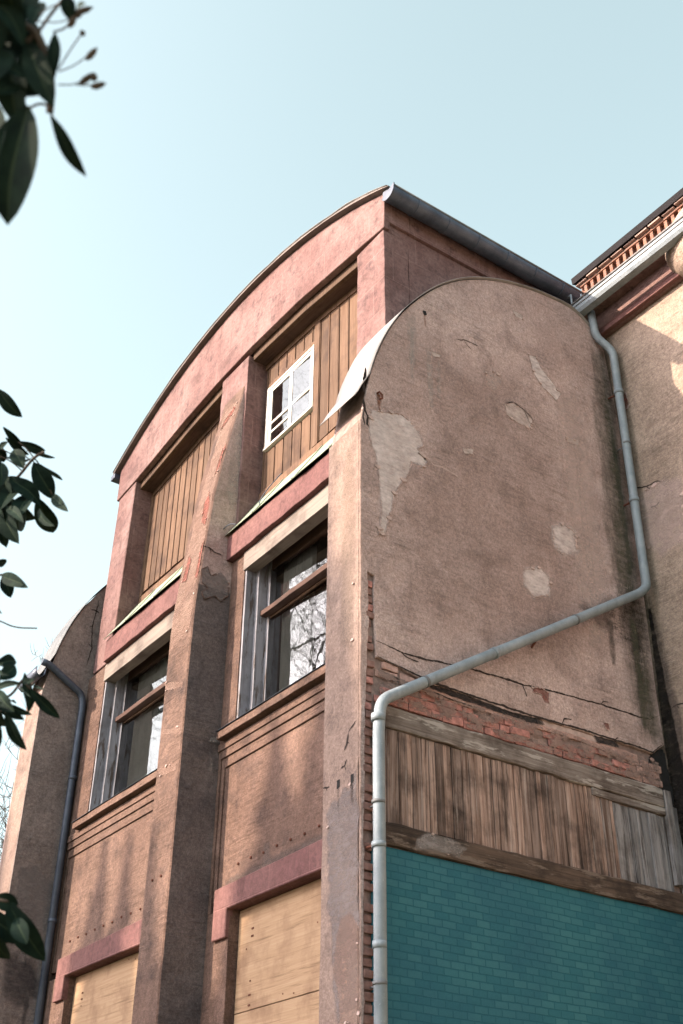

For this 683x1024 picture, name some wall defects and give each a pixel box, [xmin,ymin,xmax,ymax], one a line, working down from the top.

flaking render [505,402,534,429]
flaking render [528,353,560,400]
flaking render [169,401,238,652]
flaking render [368,410,428,536]
flaking render [524,566,553,598]
flaking render [553,522,579,554]
crack [376,640,683,753]
flaking render [326,580,674,1024]